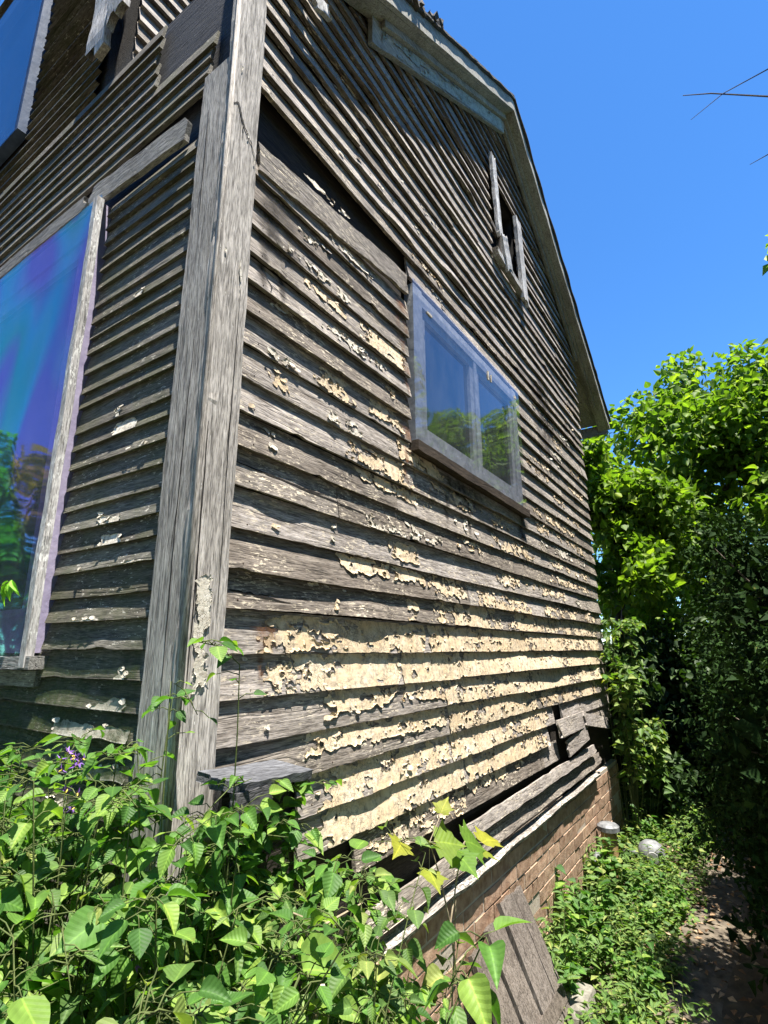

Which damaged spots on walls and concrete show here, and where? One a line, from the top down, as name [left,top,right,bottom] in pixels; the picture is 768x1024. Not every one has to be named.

peeling [306,175,350,219]
peeling [298,226,373,279]
peeling [281,245,406,371]
peeling [112,404,137,435]
peeling [97,512,122,546]
peeling [242,347,602,862]
peeling [190,574,213,694]